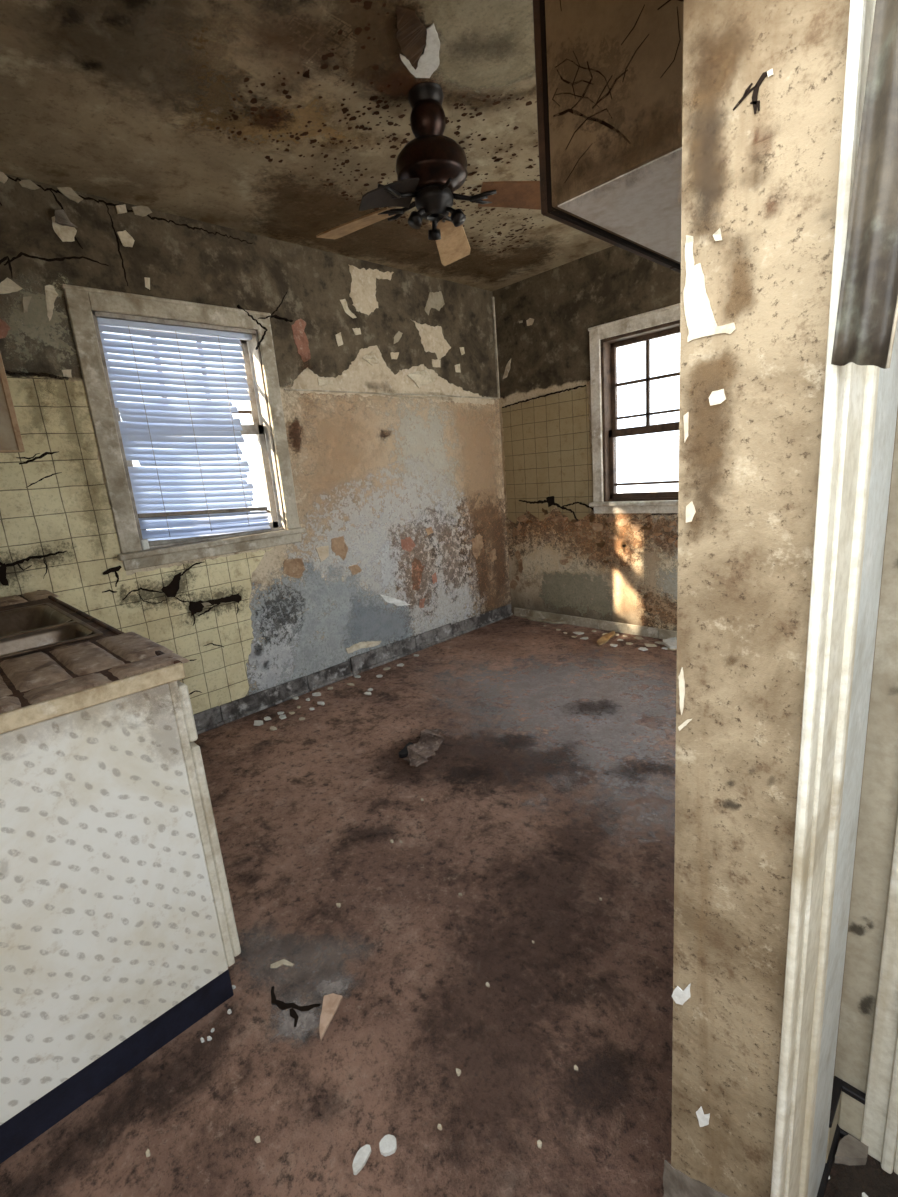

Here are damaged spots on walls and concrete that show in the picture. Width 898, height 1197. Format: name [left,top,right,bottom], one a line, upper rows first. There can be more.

peeling [395,0,536,108]
leakage [172,0,552,282]
leakage [609,29,739,234]
crack [0,172,253,286]
peeling [291,264,494,405]
peeling [684,235,736,342]
leakage [727,244,751,314]
leakage [689,353,734,529]
crack [519,496,594,525]
peeling [506,501,696,631]
peeling [120,536,419,731]
leakage [577,701,613,714]